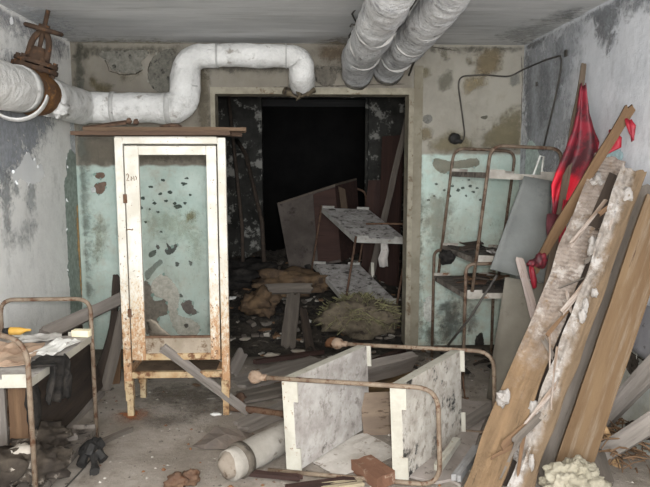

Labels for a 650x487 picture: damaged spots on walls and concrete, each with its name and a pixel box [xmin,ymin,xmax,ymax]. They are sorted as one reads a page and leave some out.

damp [581,0,650,44]
damp [484,10,580,172]
damp [0,110,54,227]
peeling [91,172,107,195]
peeling [432,158,479,175]